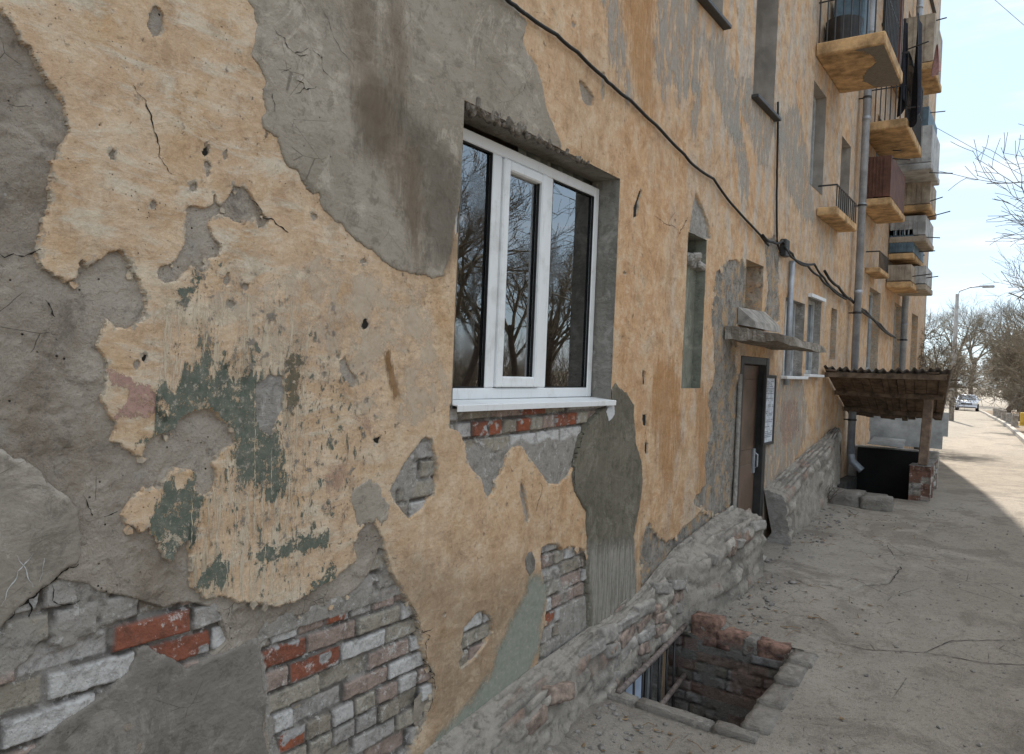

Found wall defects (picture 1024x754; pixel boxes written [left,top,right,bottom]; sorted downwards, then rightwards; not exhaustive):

crack [272,23,353,104]
crack [133,85,172,174]
spalling [464,96,590,166]
flaking render [0,14,435,754]
flaking render [449,406,604,496]
spalling [459,611,489,667]
flaking render [538,544,588,663]